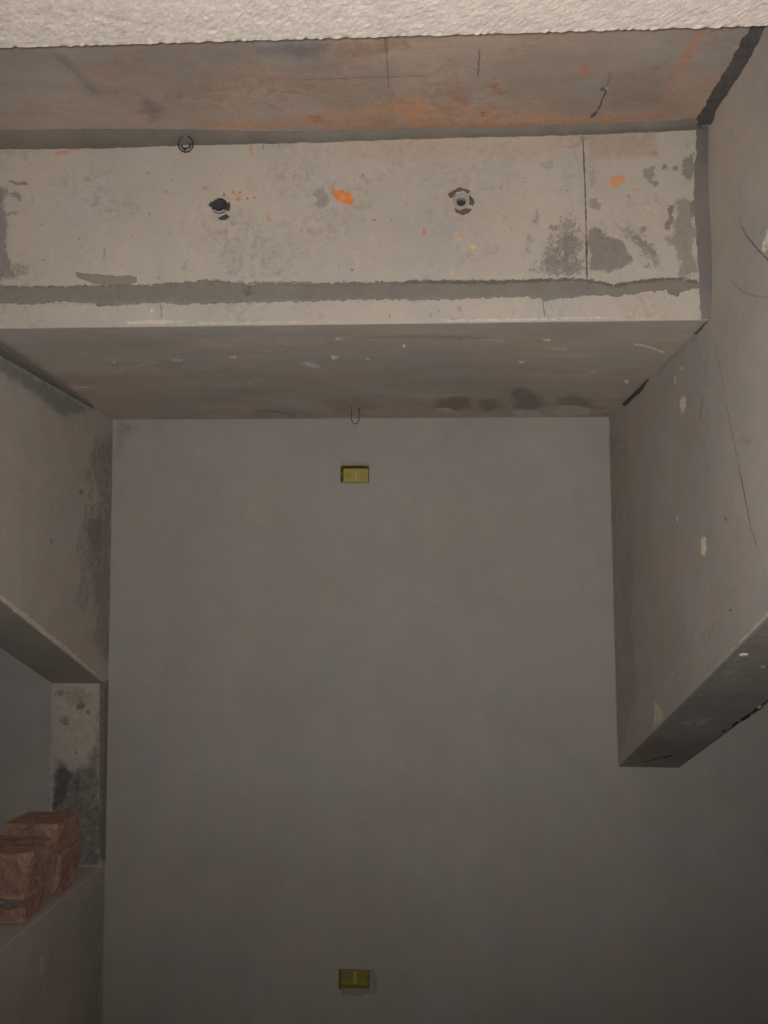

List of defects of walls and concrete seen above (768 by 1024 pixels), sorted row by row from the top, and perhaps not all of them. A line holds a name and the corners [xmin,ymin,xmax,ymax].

rust [331,188,353,205]
crack [562,72,611,277]